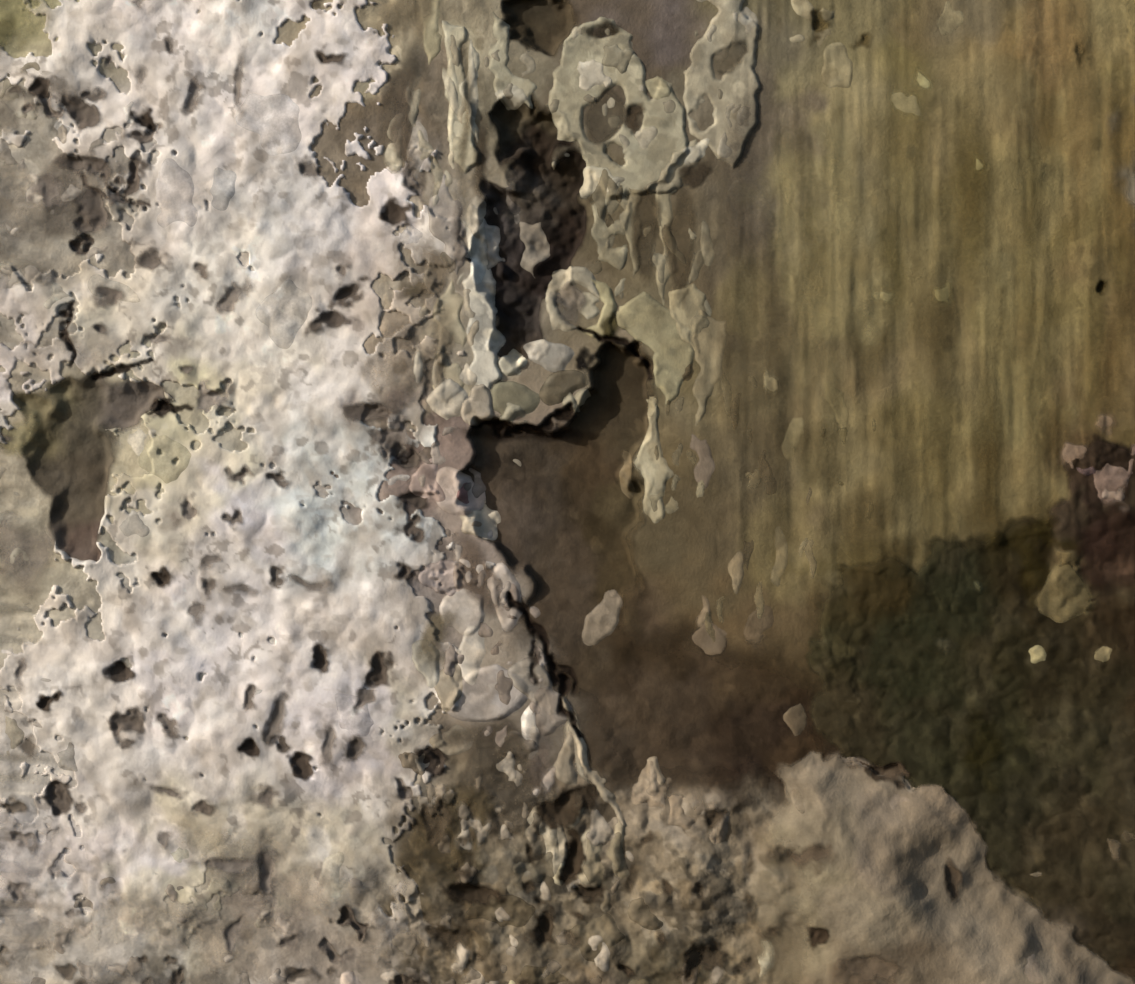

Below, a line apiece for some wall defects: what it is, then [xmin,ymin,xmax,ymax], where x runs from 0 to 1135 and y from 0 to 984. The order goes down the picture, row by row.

water stain [811,10,833,46]
water stain [937,1,964,35]
peeling [821,42,853,88]
water stain [891,72,931,117]
water stain [729,103,765,229]
water stain [731,260,778,393]
peeling [0,0,835,984]
peeling [1061,443,1135,502]
peeling [1035,548,1093,623]
peeling [1029,645,1047,664]
peeling [1094,646,1112,662]
water stain [806,415,1135,979]